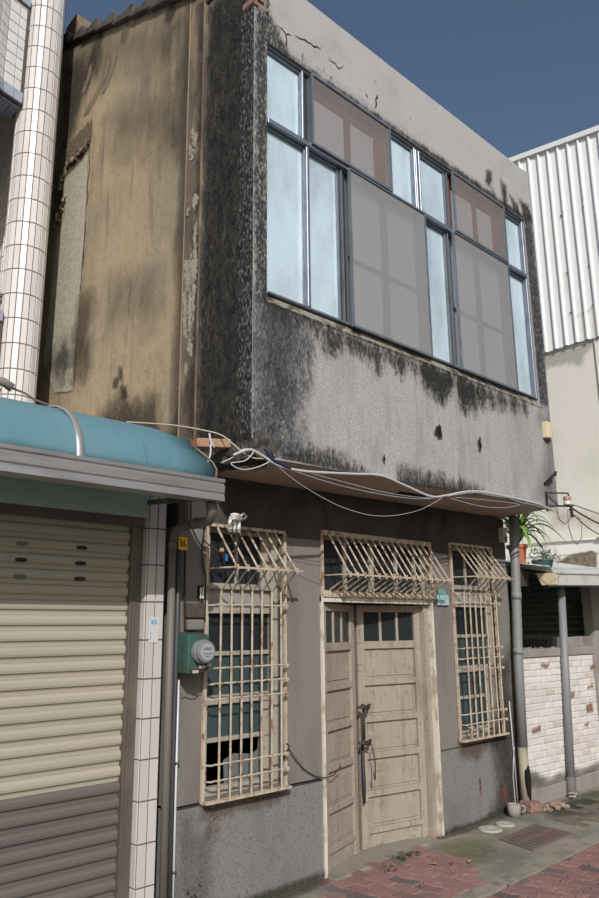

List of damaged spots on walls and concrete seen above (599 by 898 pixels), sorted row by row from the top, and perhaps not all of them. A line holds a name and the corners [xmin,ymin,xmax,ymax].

water stain [62,34,102,149]
peeling [187,126,199,161]
crack [279,26,343,81]
peeling [182,193,199,375]
water stain [105,0,548,473]
water stain [398,465,482,496]